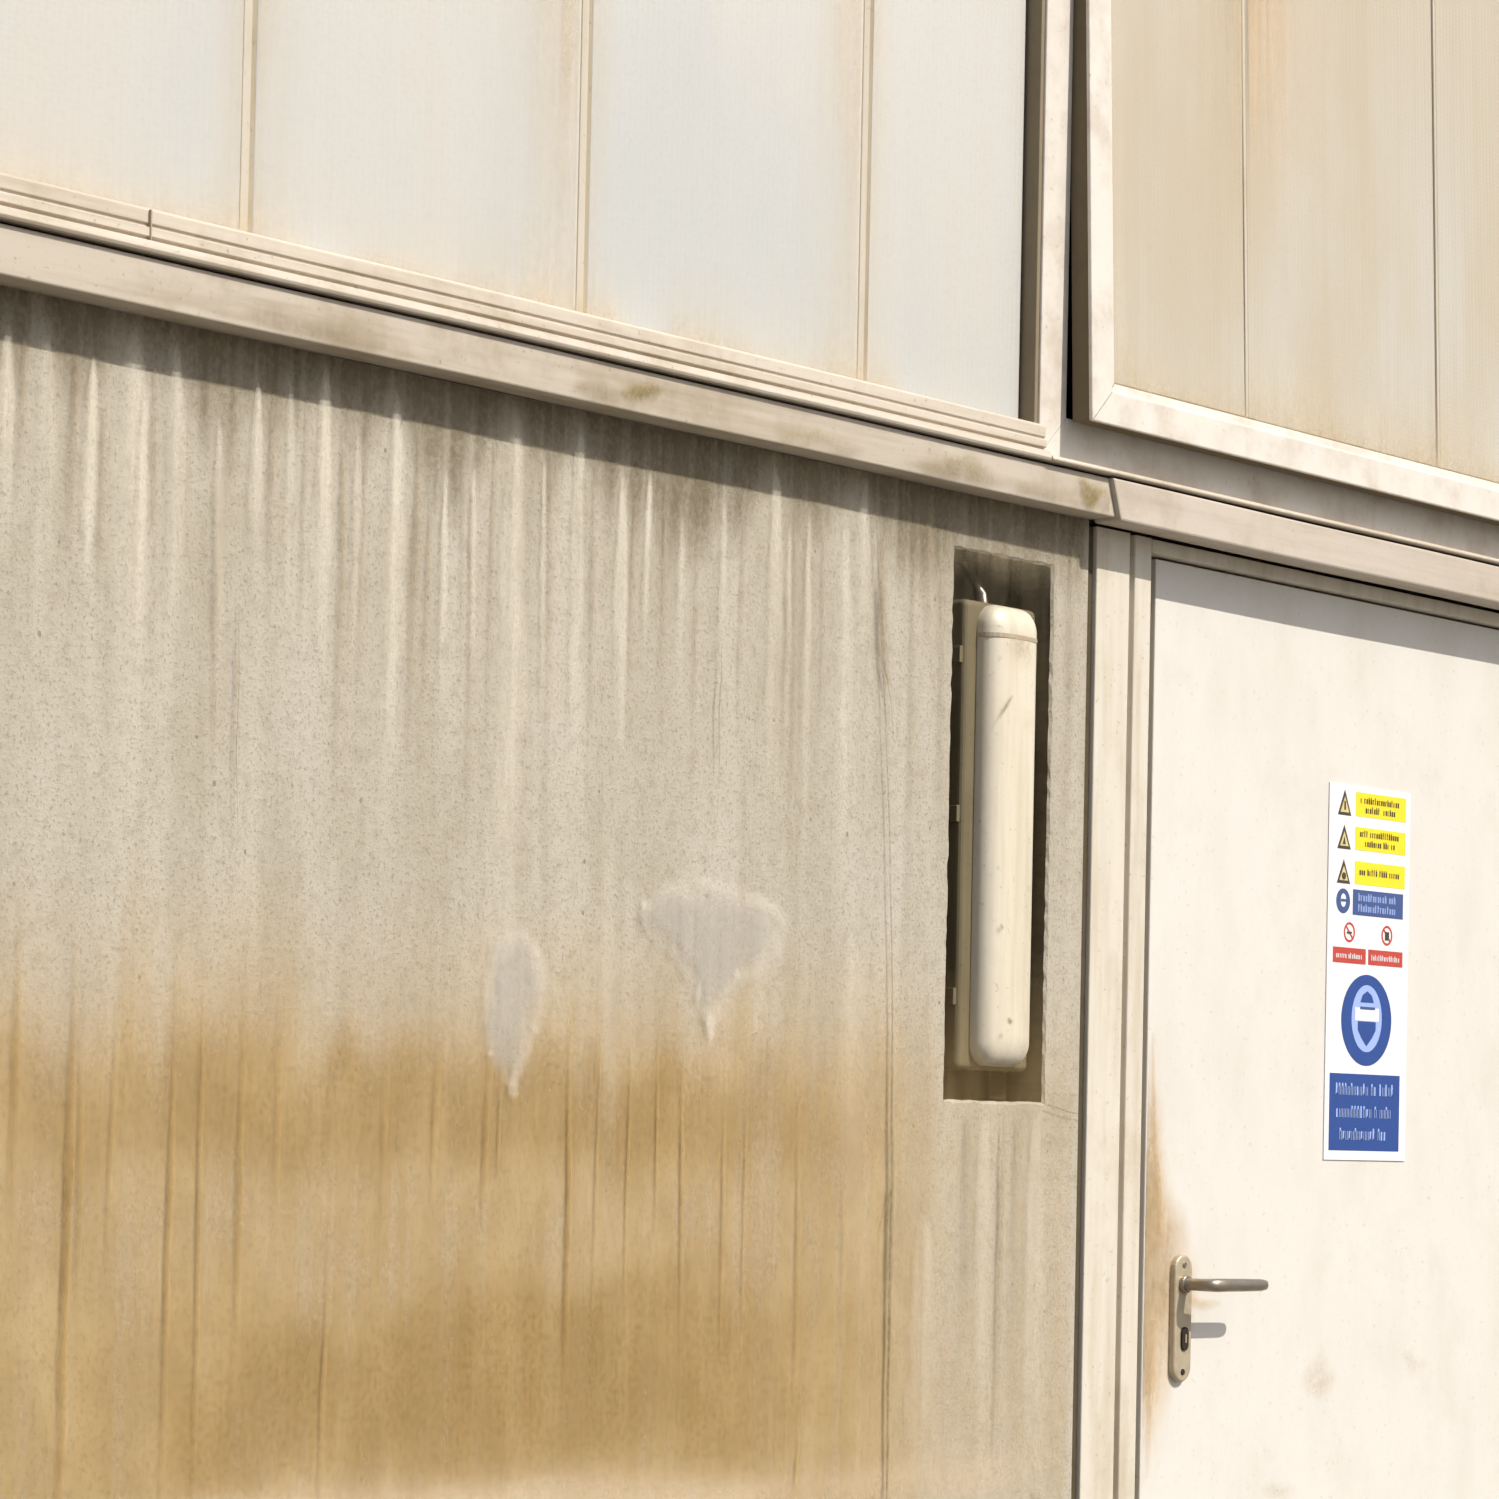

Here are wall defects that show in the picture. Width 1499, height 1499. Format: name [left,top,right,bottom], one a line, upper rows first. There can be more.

water stain [0,286,1083,562]
corrosion [1143,1135,1171,1398]